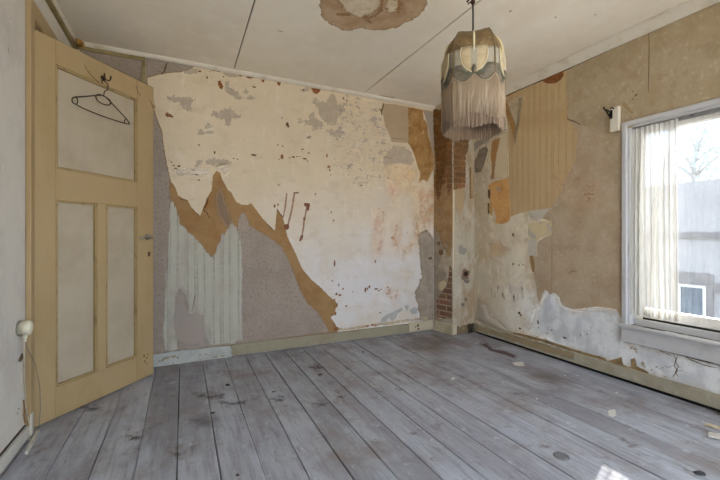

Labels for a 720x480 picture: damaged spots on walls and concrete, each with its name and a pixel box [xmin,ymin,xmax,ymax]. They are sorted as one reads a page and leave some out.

damp [319,0,427,31]
peeling [197,109,241,135]
peeling [298,94,352,139]
corrosion [274,192,299,230]
flaking render [380,109,469,332]
peeling [528,208,552,256]
peeling [513,320,658,375]
crack [627,342,720,377]